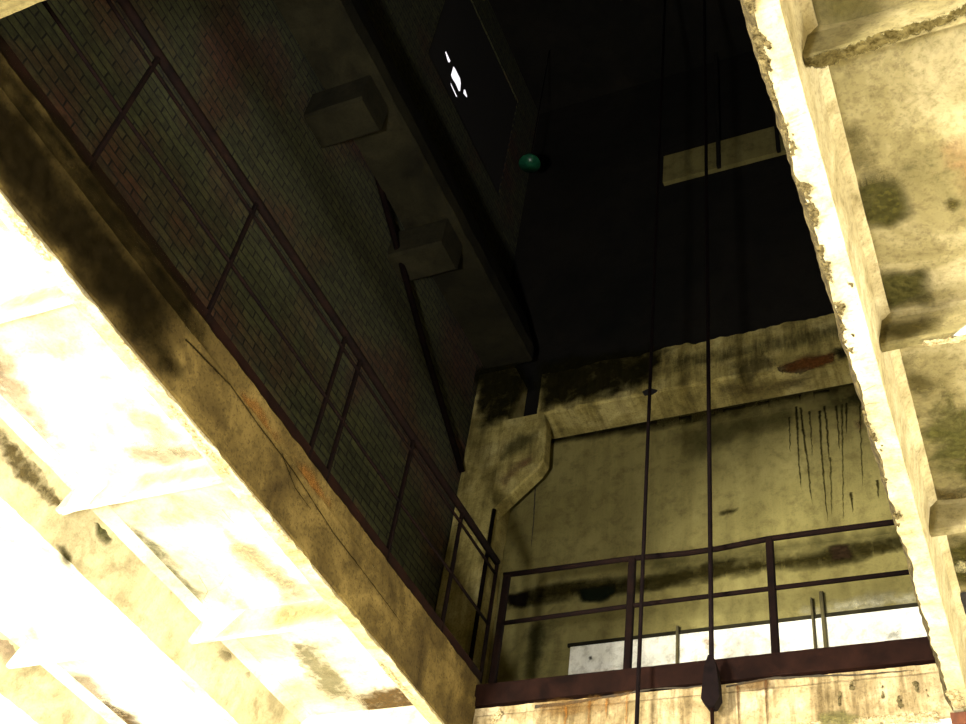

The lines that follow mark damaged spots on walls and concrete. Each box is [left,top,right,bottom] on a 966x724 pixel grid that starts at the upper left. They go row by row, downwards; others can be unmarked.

spalling [743,0,778,105]
spalling [804,3,966,69]
spalling [781,122,797,157]
spalling [796,181,833,284]
water stain [858,175,907,227]
water stain [881,270,928,308]
spalling [833,301,855,354]
water stain [551,327,863,518]
water stain [0,430,61,506]
water stain [508,531,903,608]
water stain [949,538,966,583]
water stain [294,644,347,696]